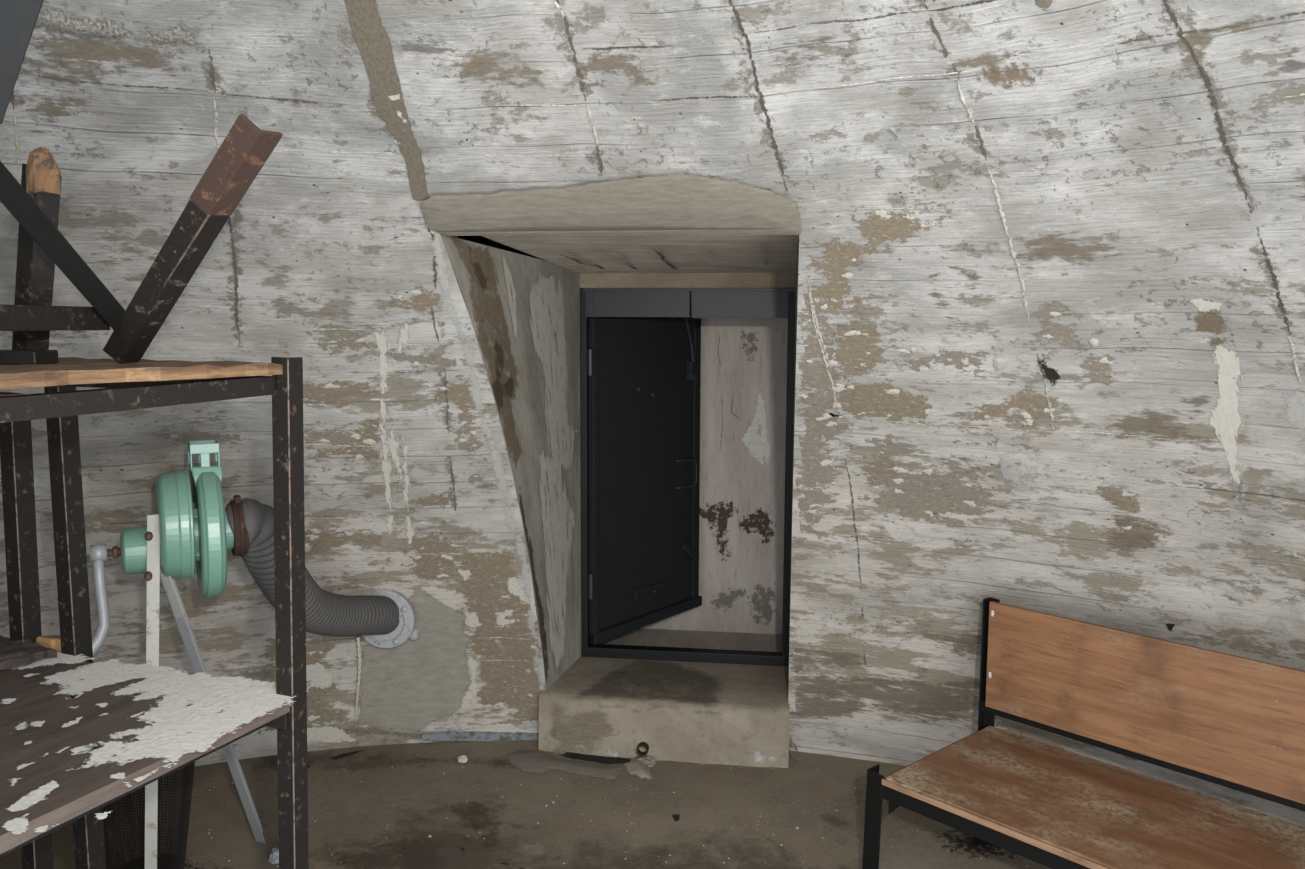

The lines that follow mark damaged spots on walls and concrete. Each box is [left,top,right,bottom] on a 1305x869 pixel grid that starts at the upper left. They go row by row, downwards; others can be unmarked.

crack [1106,11,1305,47]
crack [659,94,757,102]
crack [596,146,604,176]
crack [1257,228,1290,335]